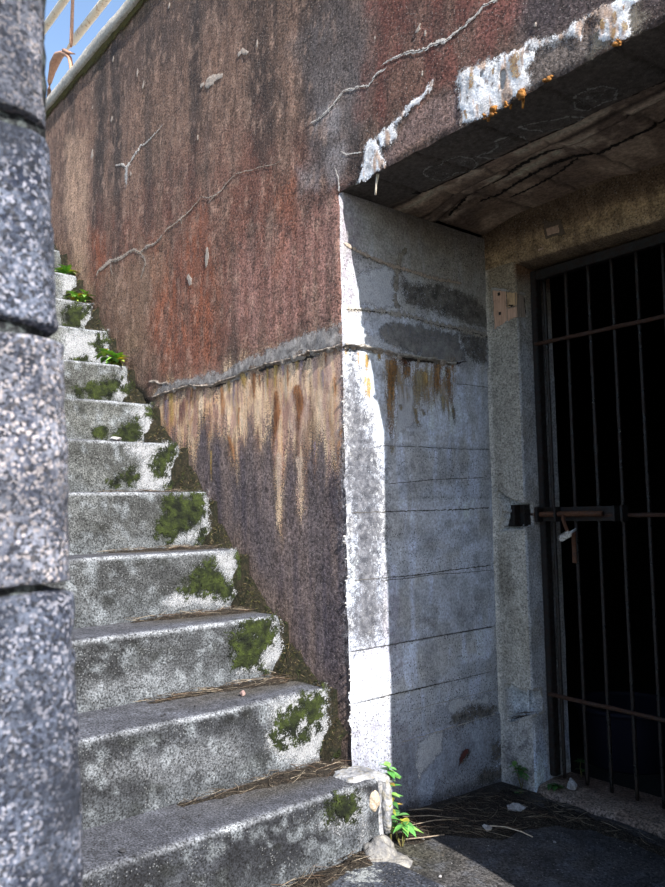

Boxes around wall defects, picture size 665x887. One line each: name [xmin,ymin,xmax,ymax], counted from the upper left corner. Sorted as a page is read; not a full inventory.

crack [115,126,162,185]
water stain [358,80,433,183]
crack [310,0,497,124]
corrosion [482,88,526,120]
crack [412,119,665,216]
crack [96,158,284,280]
water stain [60,275,110,363]
corrosion [154,329,456,537]
water stain [339,265,489,656]
water stain [177,498,211,542]
water stain [162,549,238,611]
water stain [236,615,284,675]